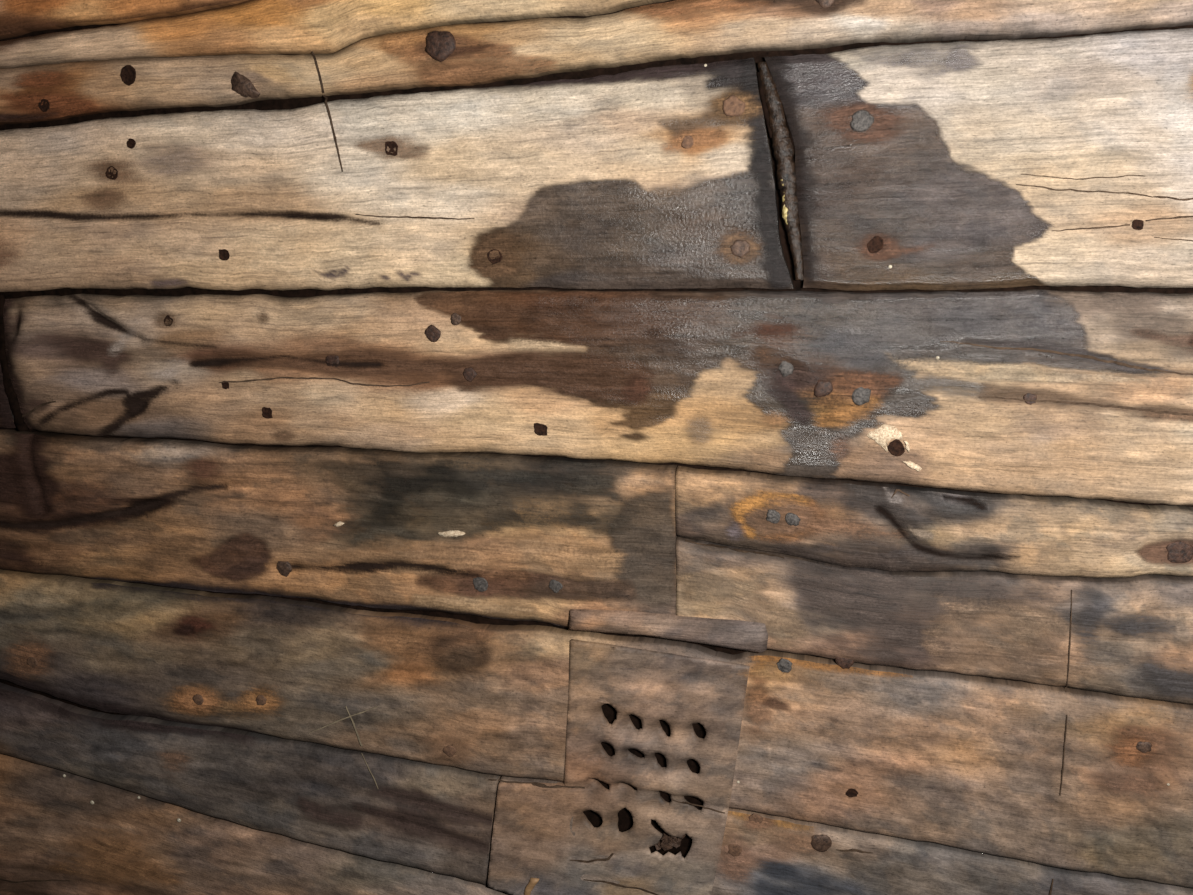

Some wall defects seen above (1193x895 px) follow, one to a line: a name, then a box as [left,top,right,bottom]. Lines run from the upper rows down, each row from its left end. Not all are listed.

damp [883,45,977,75]
rust [664,93,760,152]
damp [0,299,173,534]
damp [192,54,1193,671]
rust [755,325,902,455]
crack [877,489,1017,559]
damp [93,577,534,629]
damp [1144,659,1193,696]